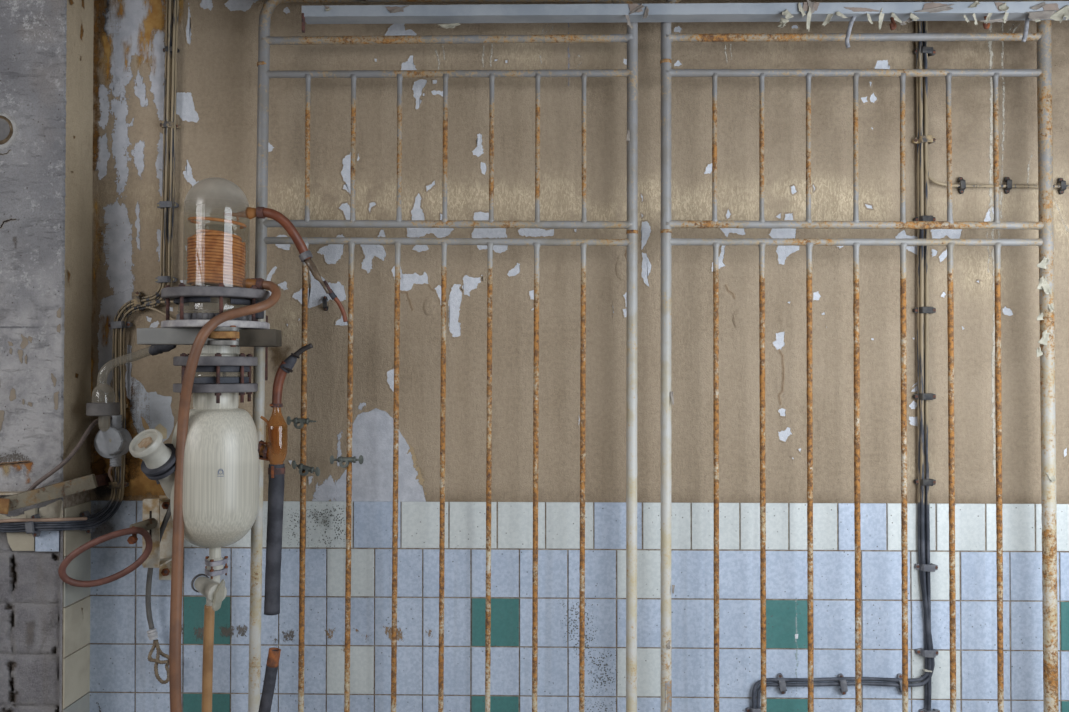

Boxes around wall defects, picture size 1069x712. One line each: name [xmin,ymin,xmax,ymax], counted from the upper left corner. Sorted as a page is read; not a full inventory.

peeling [778,0,1009,31]
peeling [399,54,443,111]
peeling [859,58,892,105]
crack [0,218,16,229]
peeling [95,0,201,395]
peeling [337,149,377,220]
peeling [470,210,556,278]
peeling [266,228,485,339]
crack [0,323,39,331]
peeling [125,345,174,442]
crack [0,459,30,467]
peeling [307,402,427,502]